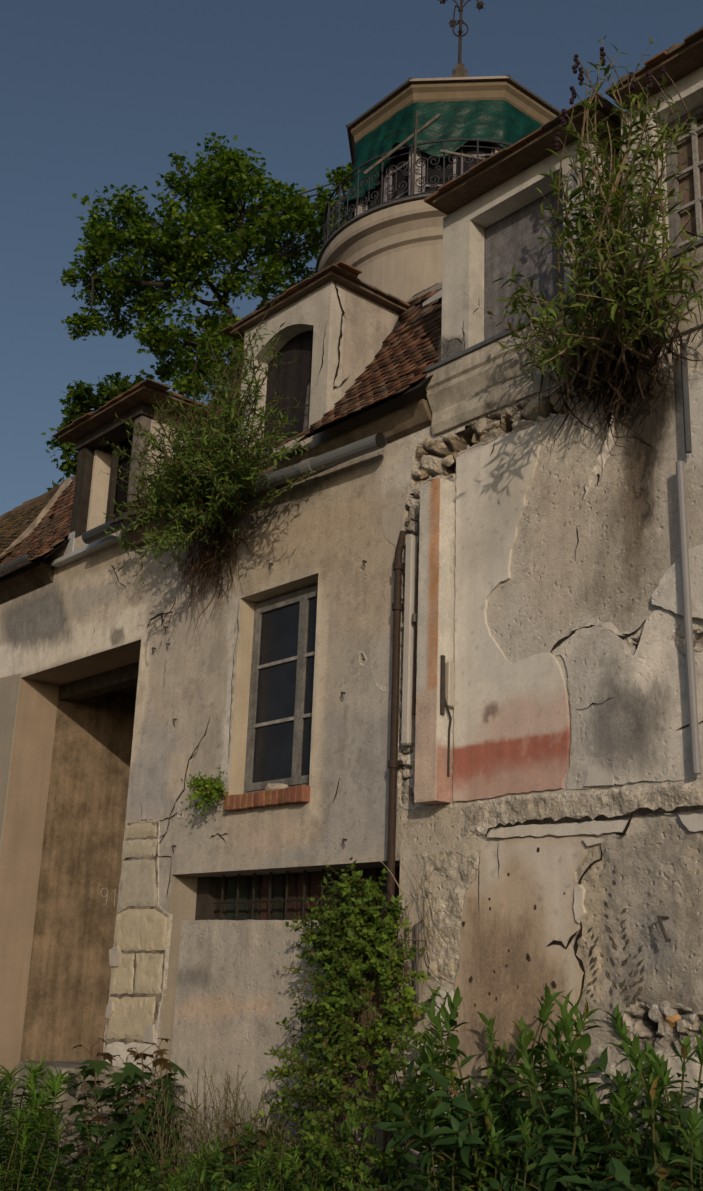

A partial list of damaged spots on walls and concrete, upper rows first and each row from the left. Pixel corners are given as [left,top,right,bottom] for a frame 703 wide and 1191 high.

crack [317,281,350,389]
crack [124,601,240,898]
flaking render [375,365,703,1100]
water stain [594,671,664,768]
water stain [464,914,561,1059]